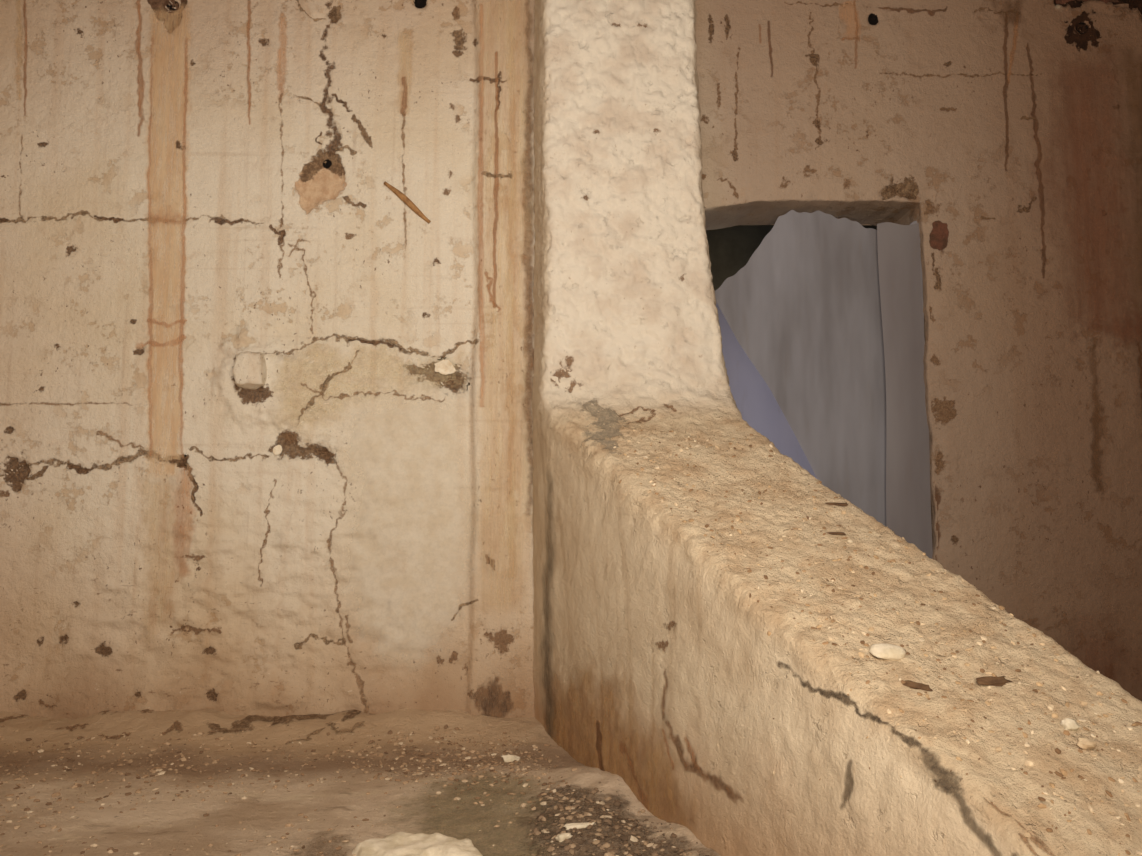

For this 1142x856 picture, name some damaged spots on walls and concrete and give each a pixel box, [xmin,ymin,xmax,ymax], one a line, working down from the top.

flaking render [147,0,187,33]
crack [299,3,372,155]
peeling [452,7,478,57]
flaking render [295,149,366,214]
rust [485,52,500,310]
crack [0,210,477,420]
peeling [551,356,581,393]
peeling [581,400,677,454]
crack [0,431,277,583]
crack [208,462,369,744]
flaking render [484,630,513,653]
crack [778,662,1052,856]